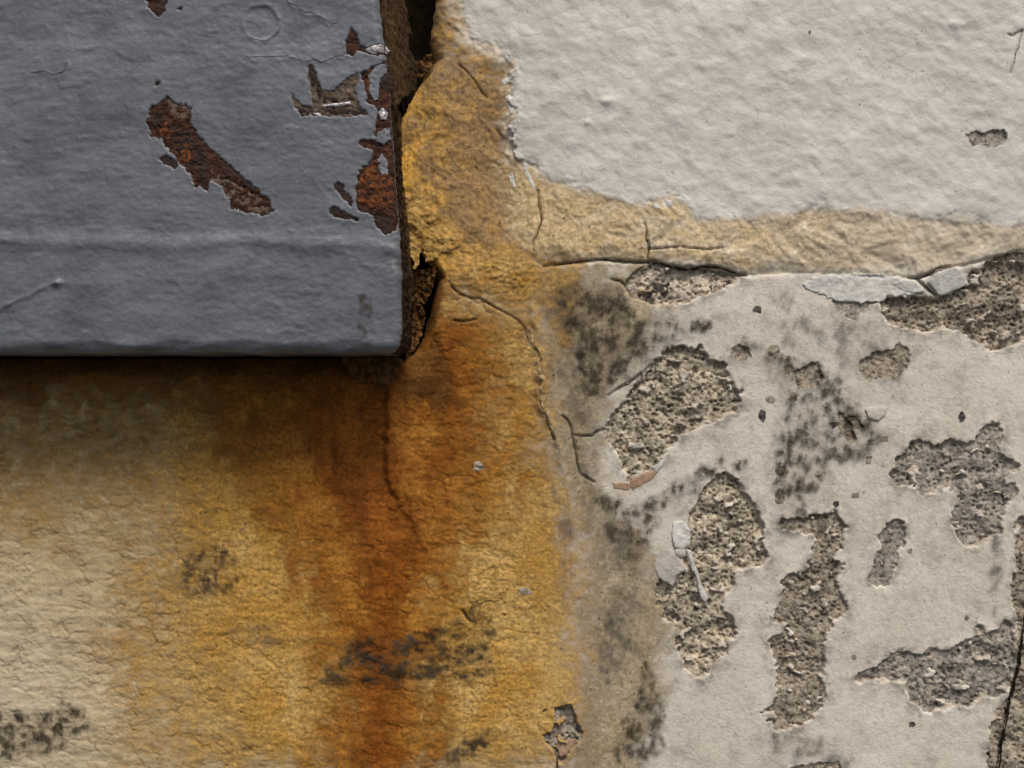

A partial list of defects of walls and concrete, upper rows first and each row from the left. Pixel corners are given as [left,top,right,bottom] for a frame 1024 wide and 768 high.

water stain [0,370,359,768]
rust [146,97,274,216]
rust [203,0,533,768]
crack [448,281,542,373]
crack [533,191,746,285]
water stain [401,0,971,768]
spalling [654,472,767,676]
spalling [766,501,846,730]
spalling [832,252,1024,351]
spalling [855,517,1024,768]
spalling [889,424,1019,547]
crack [997,616,1024,768]